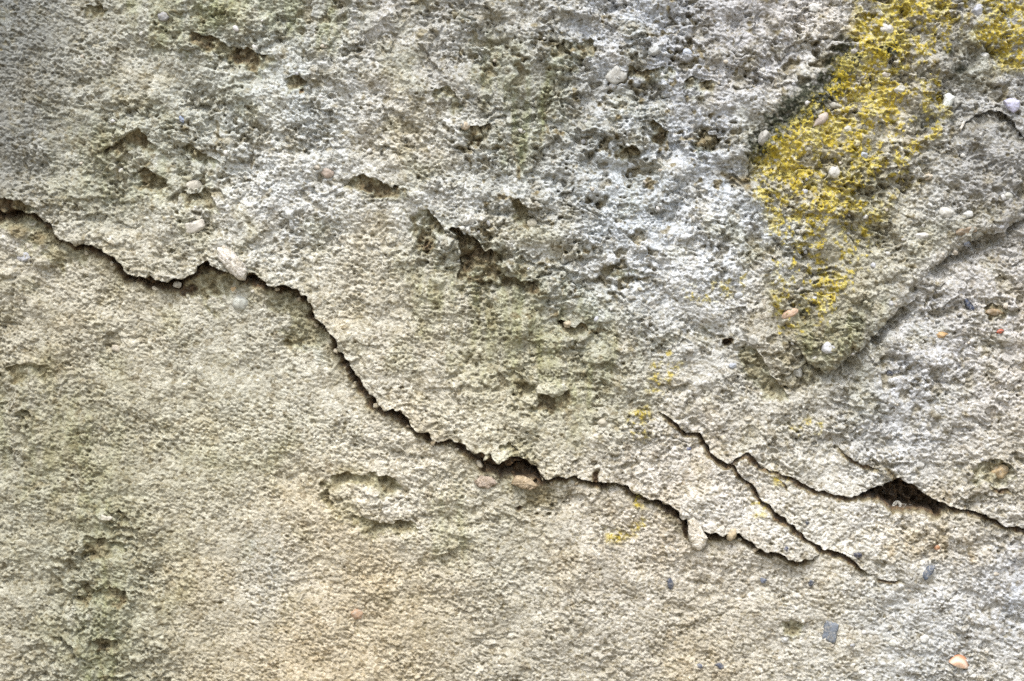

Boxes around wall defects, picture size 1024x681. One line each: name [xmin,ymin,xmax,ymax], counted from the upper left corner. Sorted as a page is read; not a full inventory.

crack [0,202,910,587]
crack [938,480,1024,536]